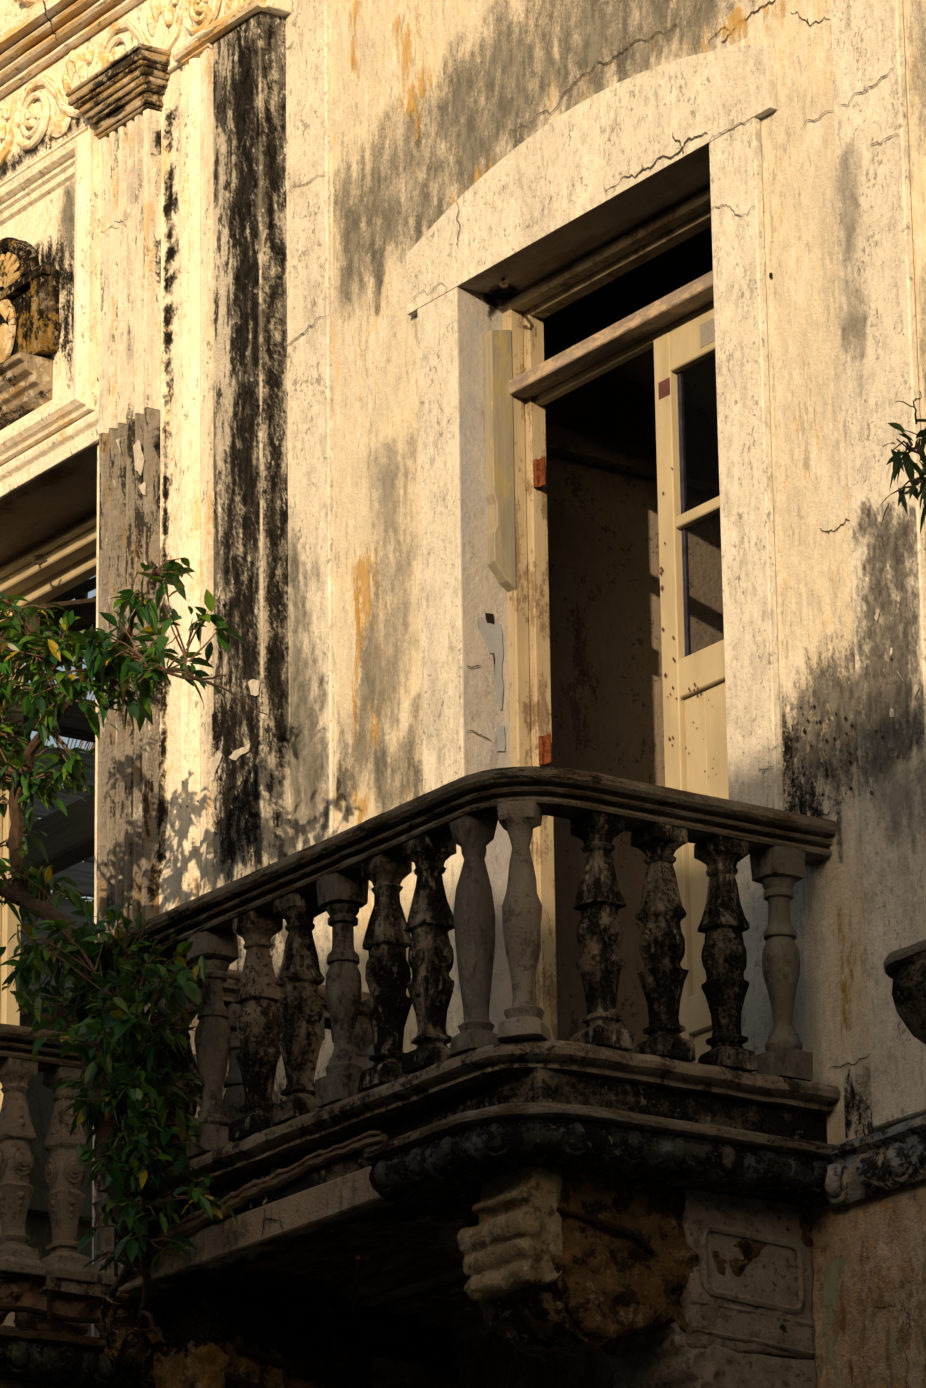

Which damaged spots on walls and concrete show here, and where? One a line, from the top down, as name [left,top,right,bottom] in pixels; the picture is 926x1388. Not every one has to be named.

water stain [333,0,732,316]
crack [512,20,681,131]
crack [606,118,751,191]
crack [707,0,830,44]
water stain [146,106,179,660]
water stain [211,20,422,877]
water stain [147,679,171,902]
water stain [781,501,926,863]